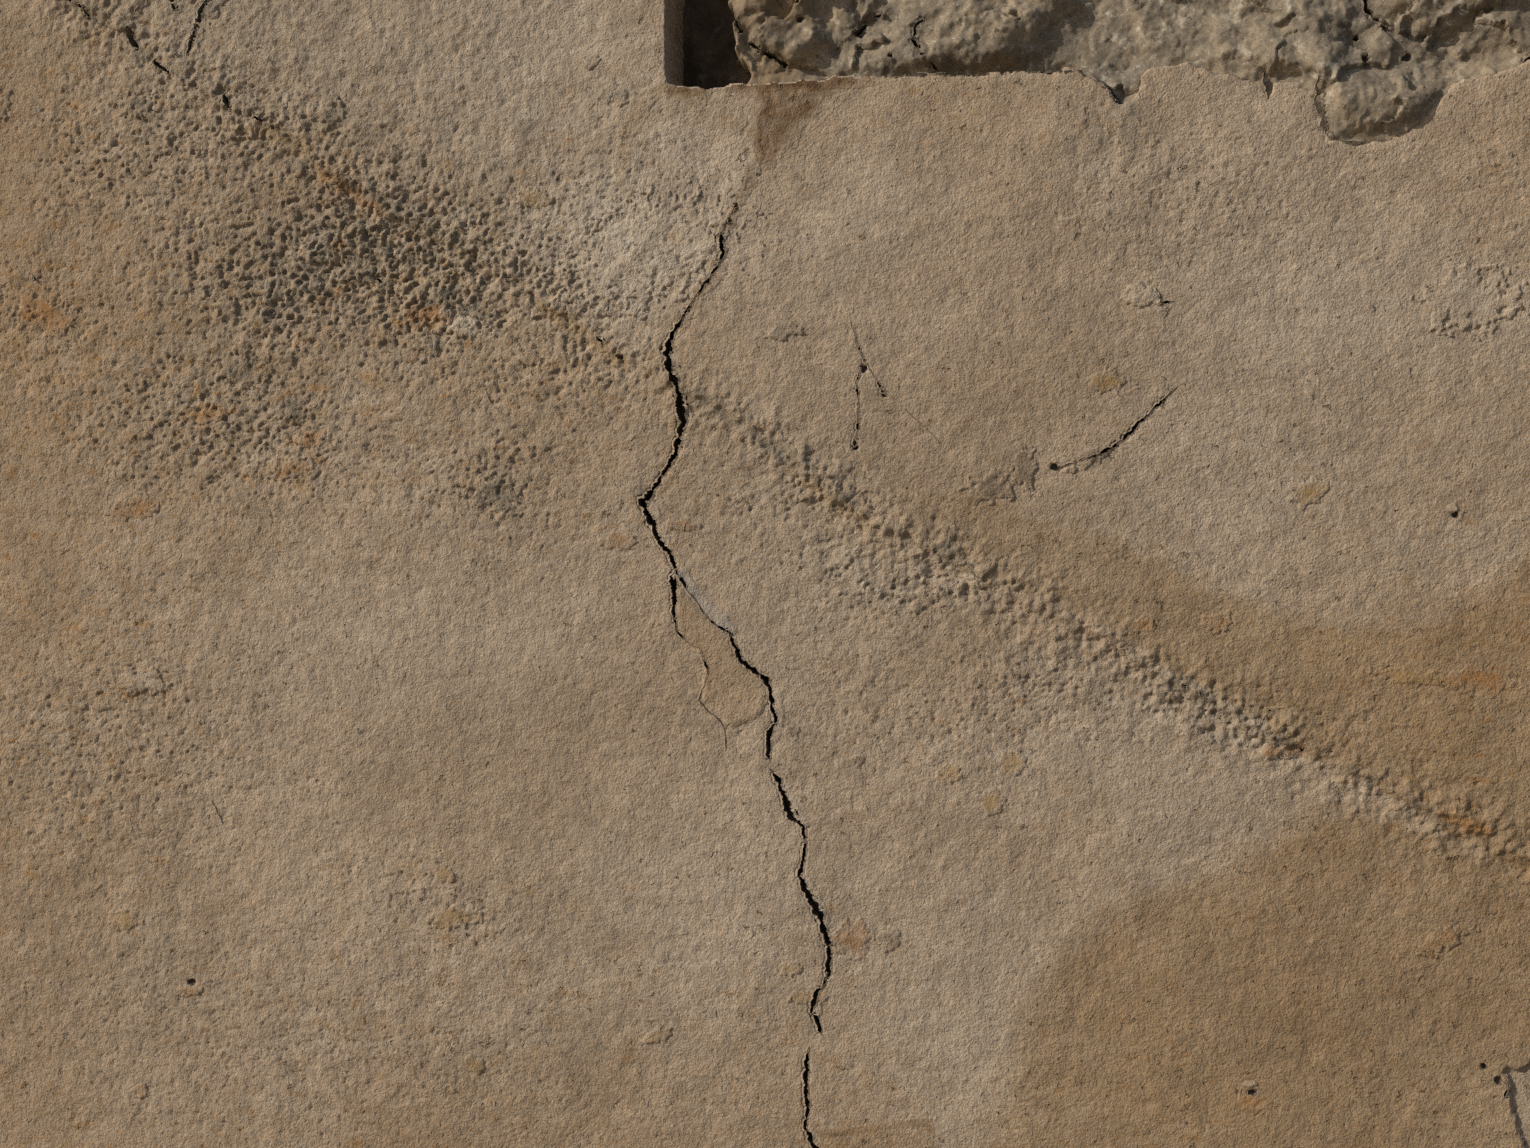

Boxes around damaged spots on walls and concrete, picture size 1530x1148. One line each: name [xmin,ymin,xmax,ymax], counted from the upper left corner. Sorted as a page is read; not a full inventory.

flaking render [682,0,1530,146]
crack [1057,386,1178,469]
crack [637,93,834,1148]